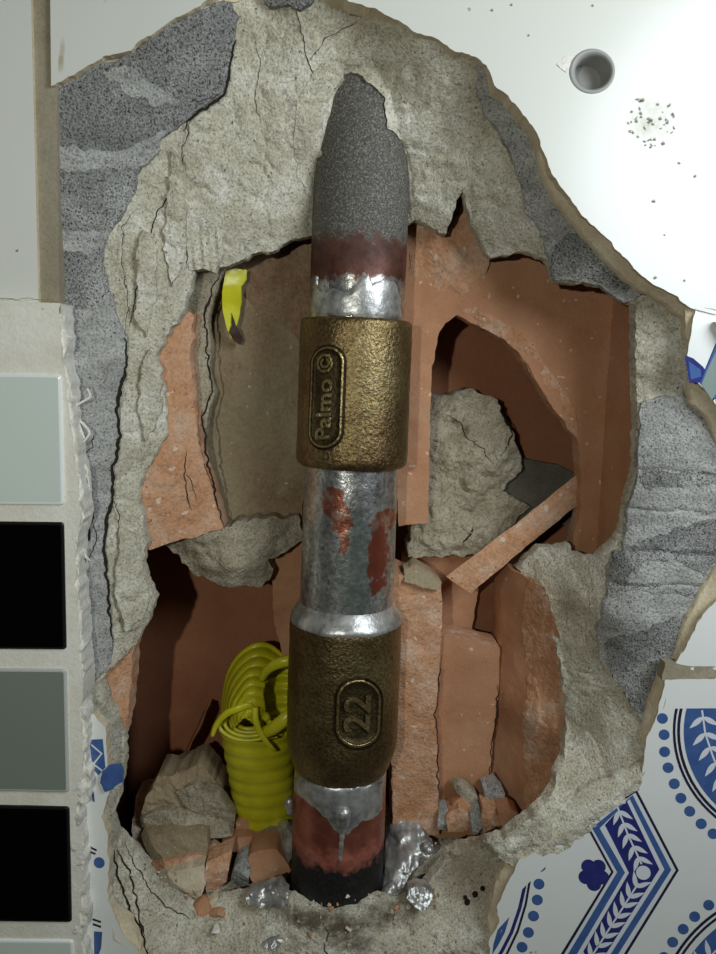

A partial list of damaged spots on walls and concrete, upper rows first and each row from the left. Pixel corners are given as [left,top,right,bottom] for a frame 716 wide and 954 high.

spalling [86,708,147,954]
spalling [58,0,631,779]
spalling [105,272,716,954]
spalling [536,150,694,350]